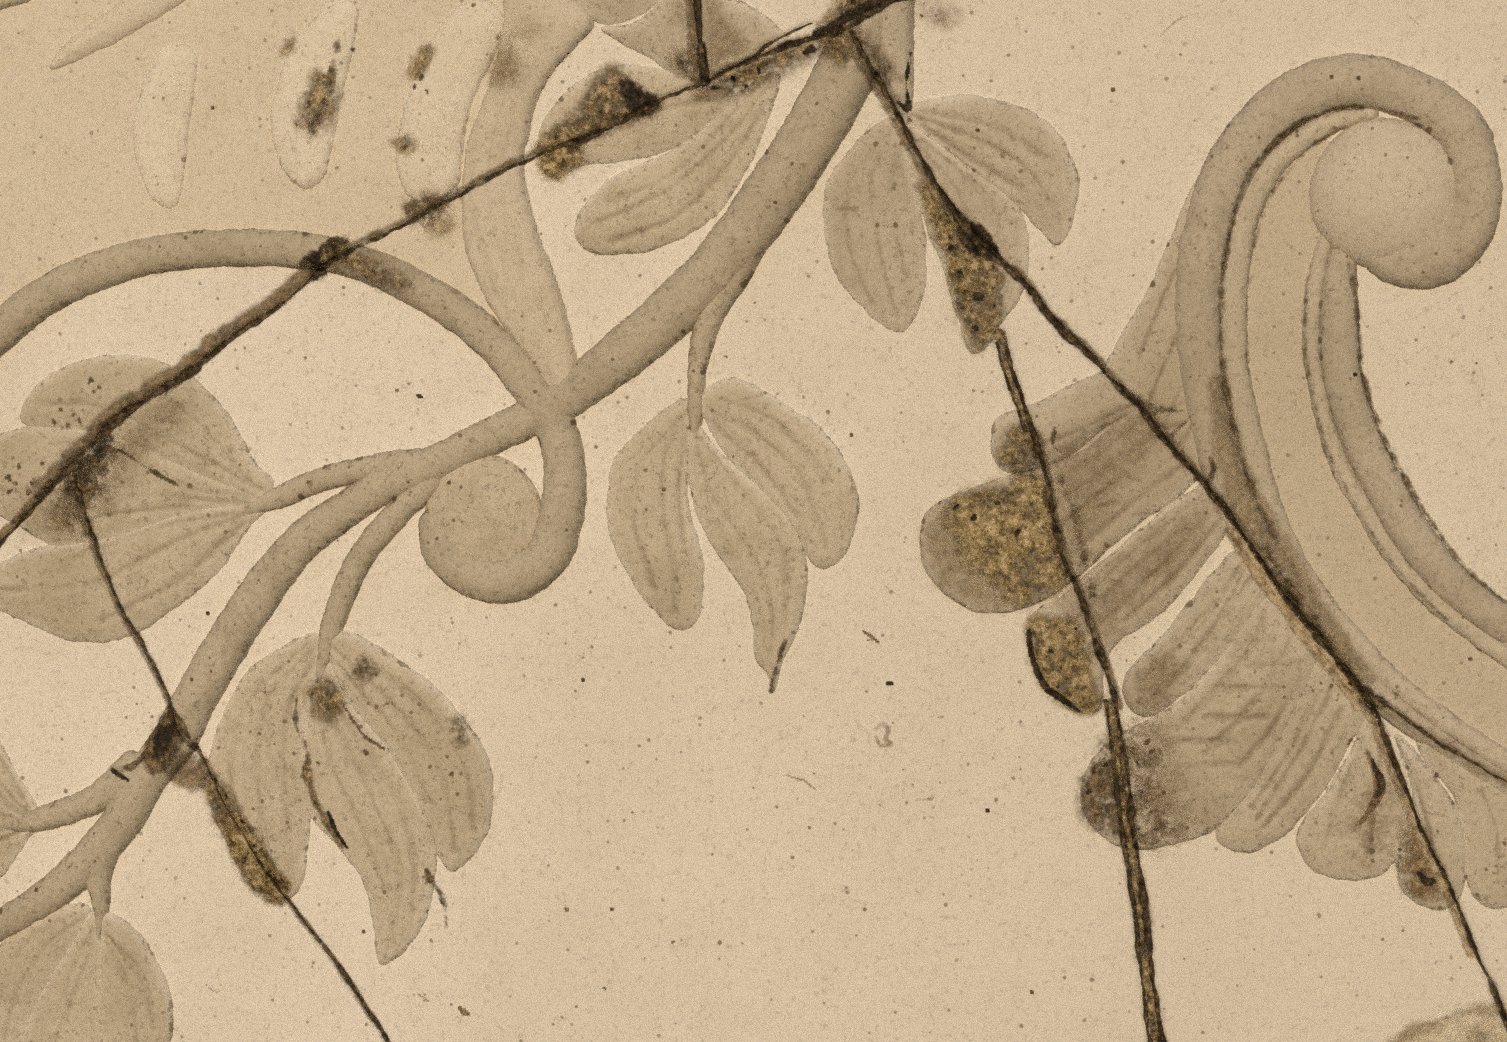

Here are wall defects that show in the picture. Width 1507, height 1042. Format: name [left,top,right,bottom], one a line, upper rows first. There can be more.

damp [170,702,201,751]
crack [68,477,389,1042]
damp [327,67,336,85]
crack [0,0,905,547]
crack [847,30,1507,1042]